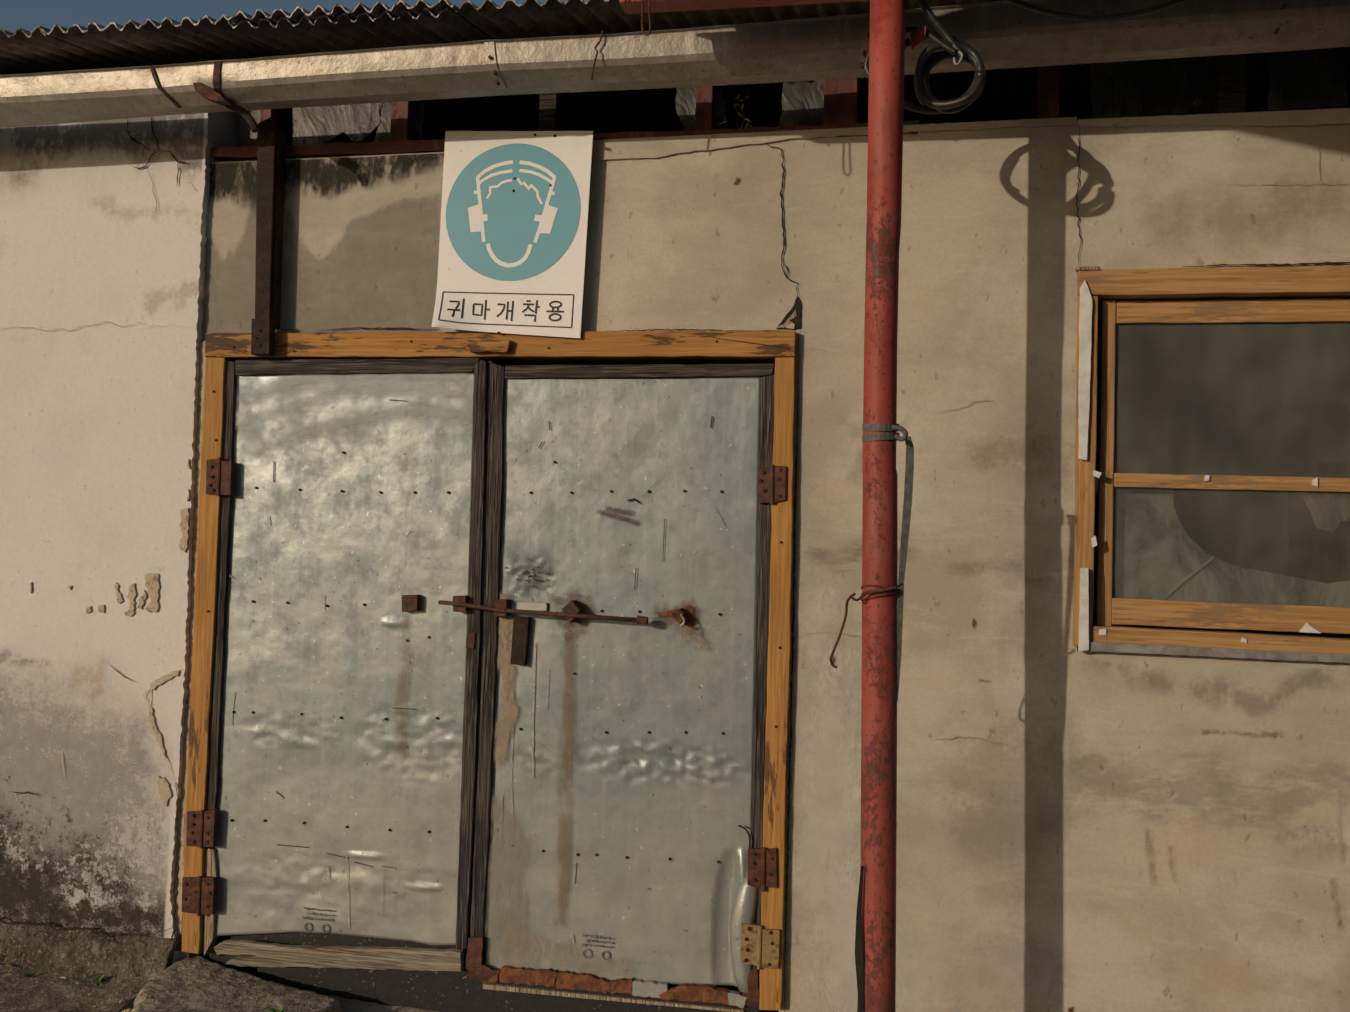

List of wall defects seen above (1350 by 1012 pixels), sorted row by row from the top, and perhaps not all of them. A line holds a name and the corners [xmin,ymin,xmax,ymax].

crack [98,118,195,212]
water stain [209,162,257,206]
water stain [284,153,444,196]
crack [765,143,799,296]
peeling [86,573,160,616]
flaking render [148,341,206,942]
water stain [0,689,165,937]